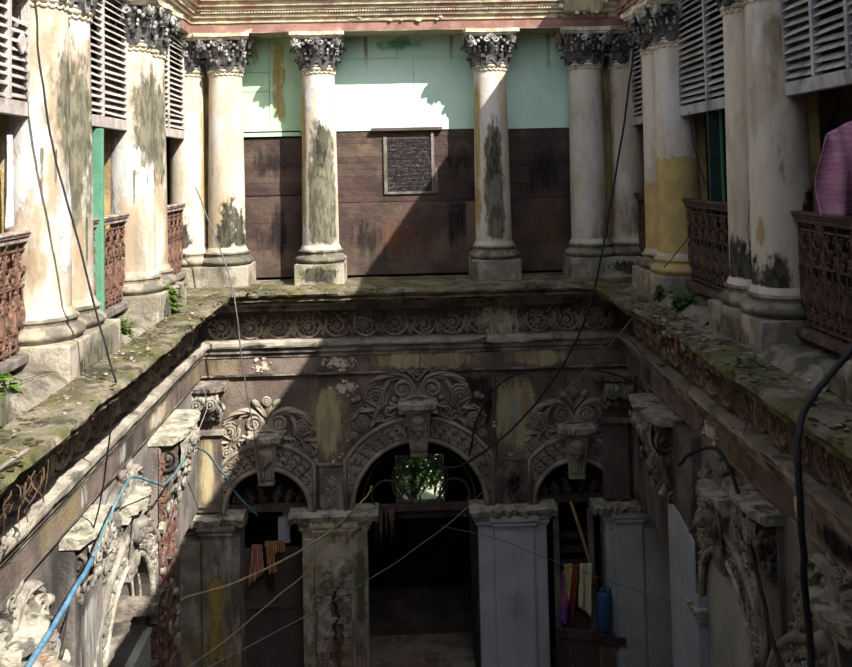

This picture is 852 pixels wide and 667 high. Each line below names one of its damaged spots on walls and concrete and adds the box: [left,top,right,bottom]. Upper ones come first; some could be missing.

damp [273,49,285,120]
peeling [311,355,359,463]
flaking render [315,540,353,667]
crack [329,587,344,666]